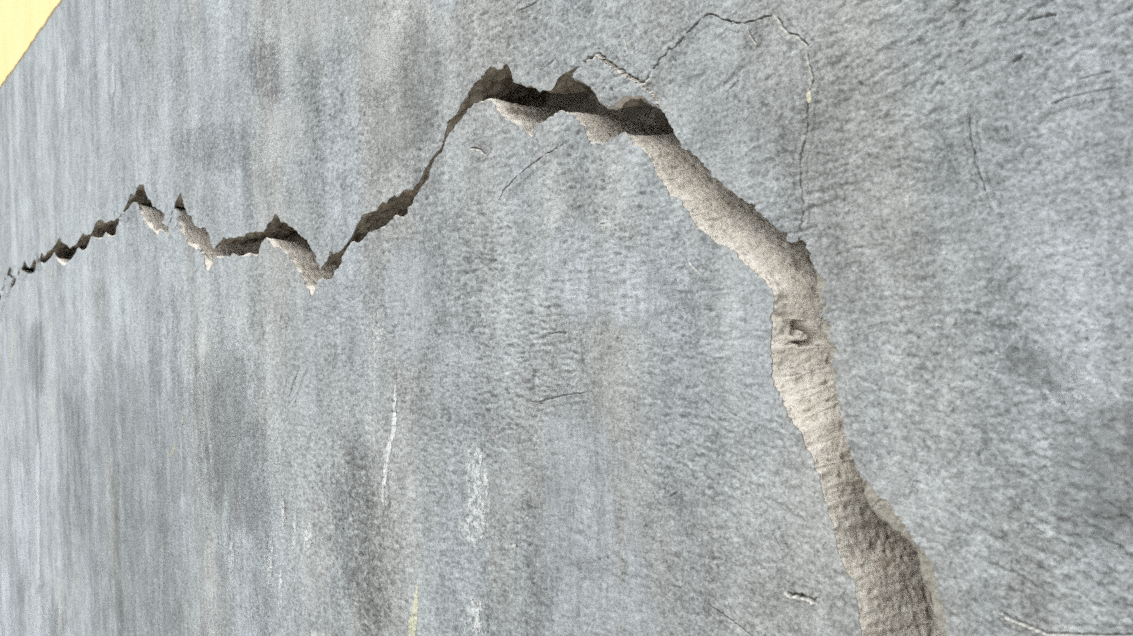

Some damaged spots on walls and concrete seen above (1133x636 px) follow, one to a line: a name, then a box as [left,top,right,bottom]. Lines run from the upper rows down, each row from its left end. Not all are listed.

crack [0,211,129,319]
crack [123,6,948,636]